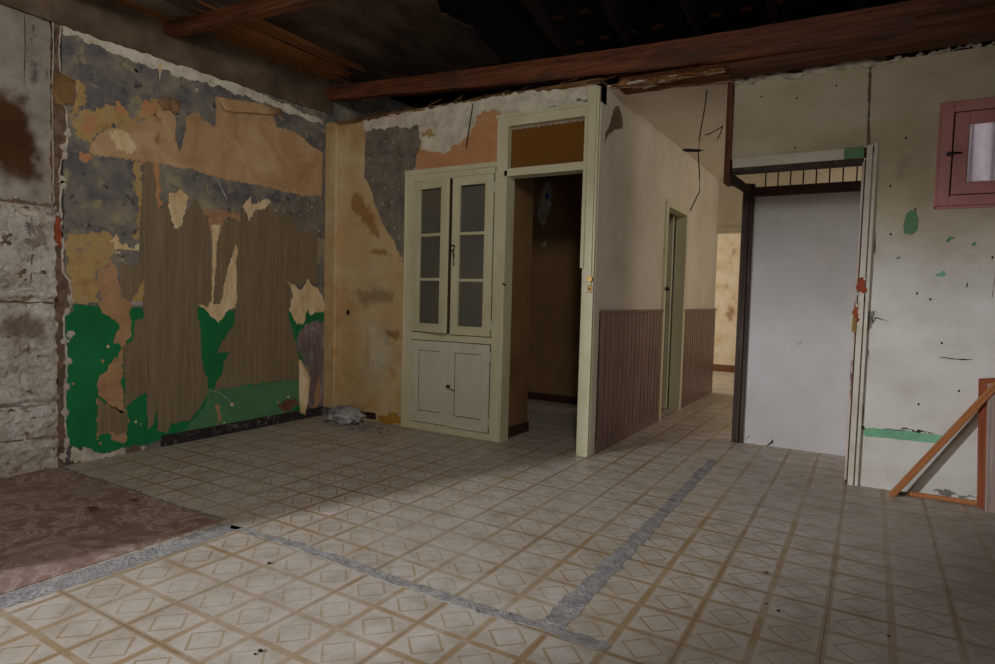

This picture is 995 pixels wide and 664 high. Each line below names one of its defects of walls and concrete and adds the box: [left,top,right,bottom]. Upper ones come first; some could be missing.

flaking render [62,26,323,125]
flaking render [611,67,718,89]
flaking render [730,41,995,86]
peeling [69,80,180,163]
flaking render [605,105,624,145]
flaking render [363,84,595,263]
peeling [64,230,324,464]